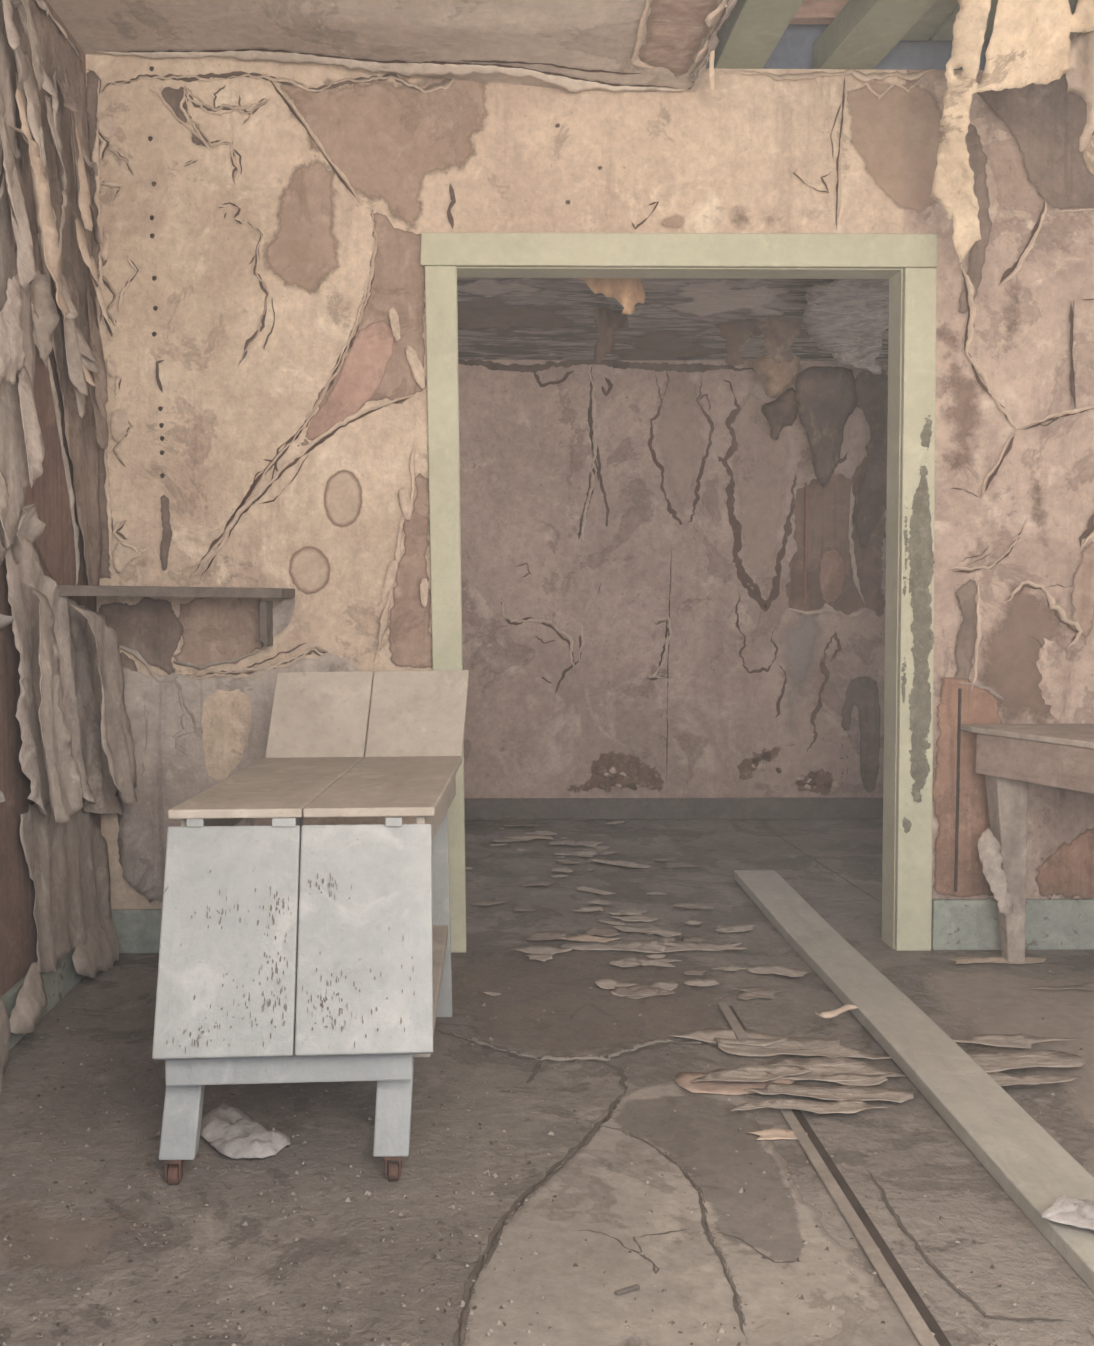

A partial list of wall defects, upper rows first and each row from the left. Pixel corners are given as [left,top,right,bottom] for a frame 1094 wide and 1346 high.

crack [36,70,132,277]
peeling [98,115,117,138]
crack [93,49,684,577]
peeling [389,308,425,389]
crack [458,359,754,540]
peeling [920,415,932,450]
crack [951,199,1094,498]
peeling [840,676,881,793]
peeling [901,466,935,803]
crack [948,518,1083,649]
crack [435,1003,793,1346]
crack [779,1109,1094,1346]